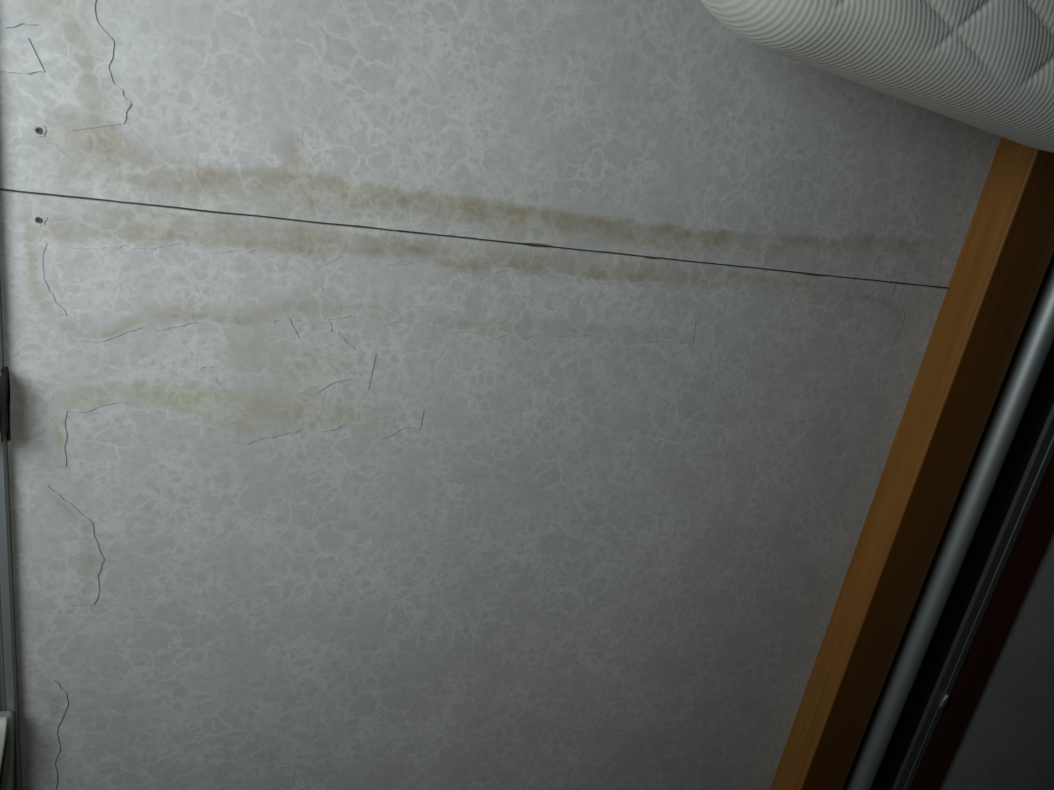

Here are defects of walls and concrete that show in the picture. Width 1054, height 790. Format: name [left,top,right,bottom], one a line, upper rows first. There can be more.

damp [0,0,948,467]